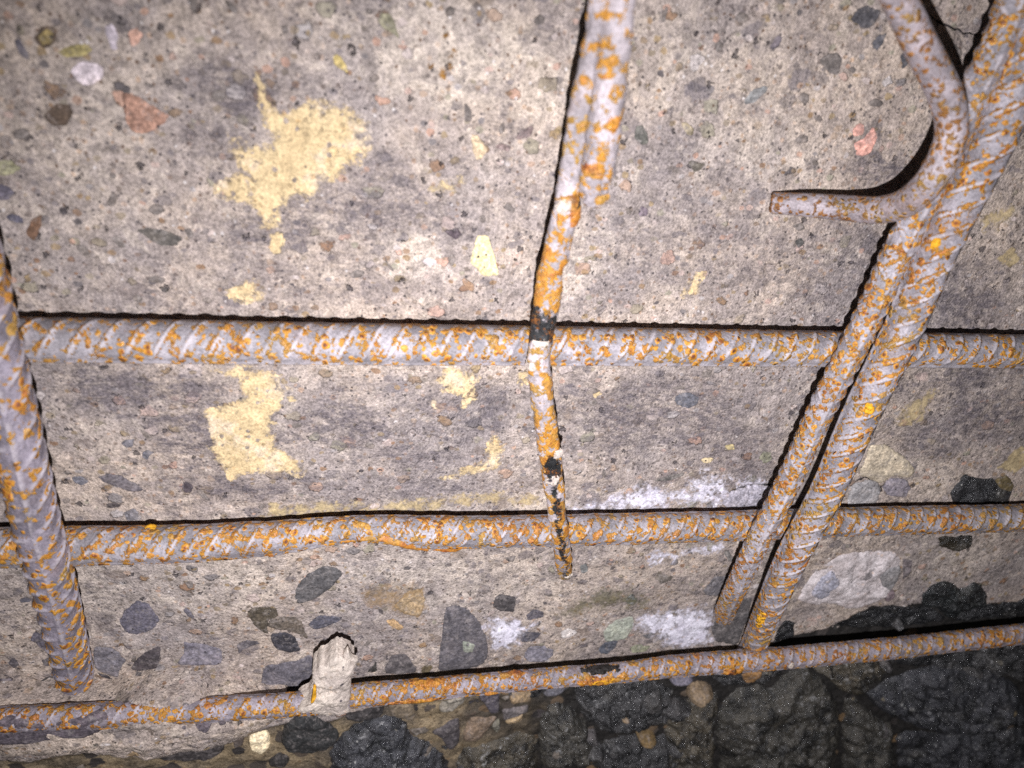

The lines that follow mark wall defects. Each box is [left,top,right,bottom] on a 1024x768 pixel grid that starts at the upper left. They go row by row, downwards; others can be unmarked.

corrosion [606,116,621,135]
peeling [213,72,372,254]
corrosion [581,162,604,180]
corrosion [560,195,581,227]
peeling [204,364,306,482]
spalling [950,446,1024,505]
peeling [268,490,537,518]
corrosion [322,536,463,552]
spalling [768,550,1024,647]
corrosion [388,678,444,705]
spalling [0,645,1024,768]
corrosion [576,676,621,687]